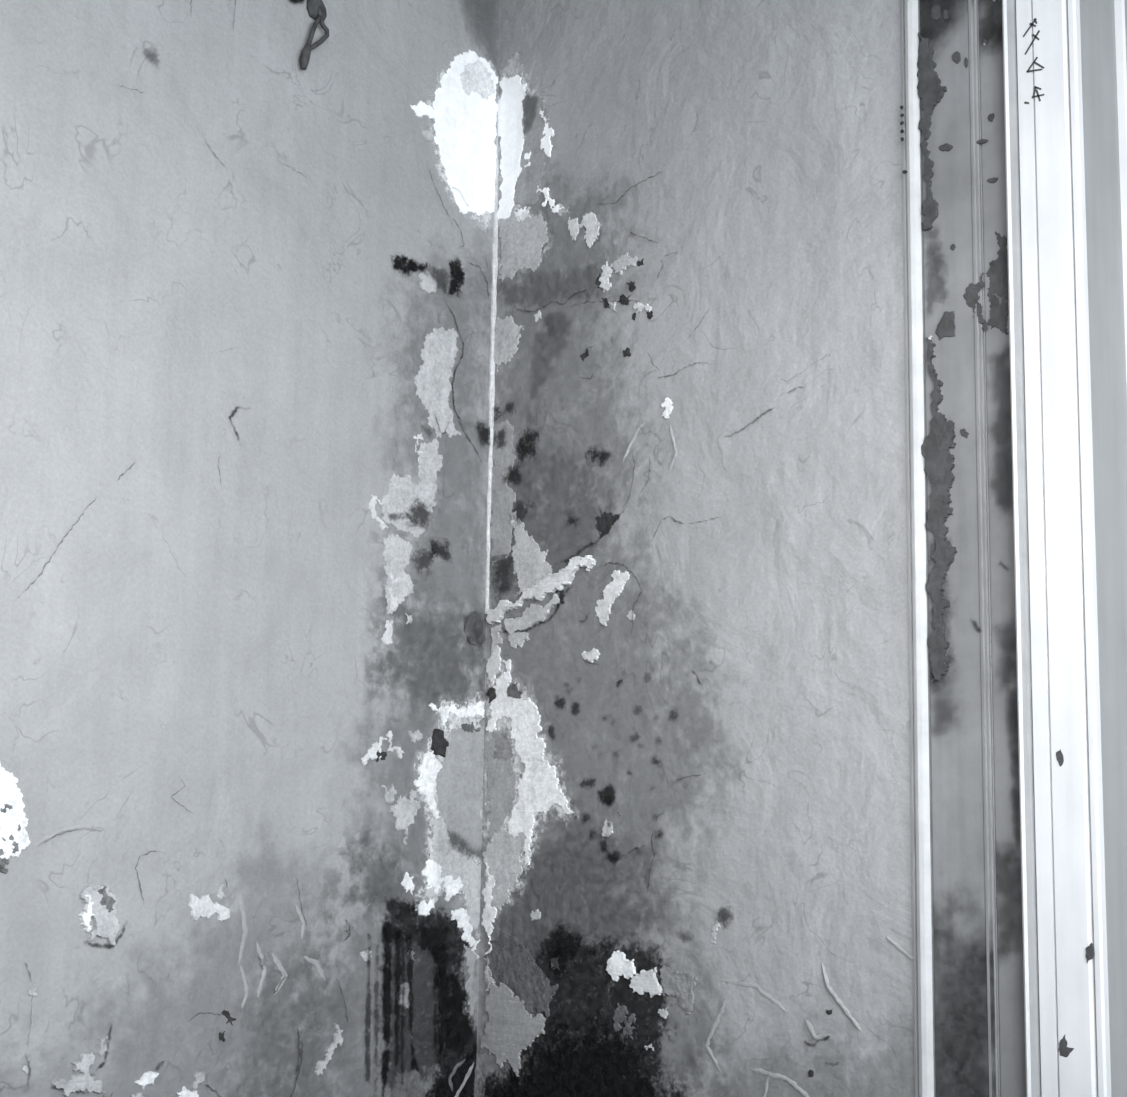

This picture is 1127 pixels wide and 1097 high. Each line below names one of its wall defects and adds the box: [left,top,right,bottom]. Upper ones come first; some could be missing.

damp [978,0,1003,44]
flaking render [410,50,602,282]
damp [394,255,465,295]
peeling [963,231,1009,335]
peeling [368,327,462,645]
peeling [921,311,969,684]
damp [994,356,1012,505]
spalling [361,419,647,1077]
damp [1008,697,1018,772]
damp [365,899,683,1097]
flaking render [605,950,698,1019]
damp [934,853,1017,1097]